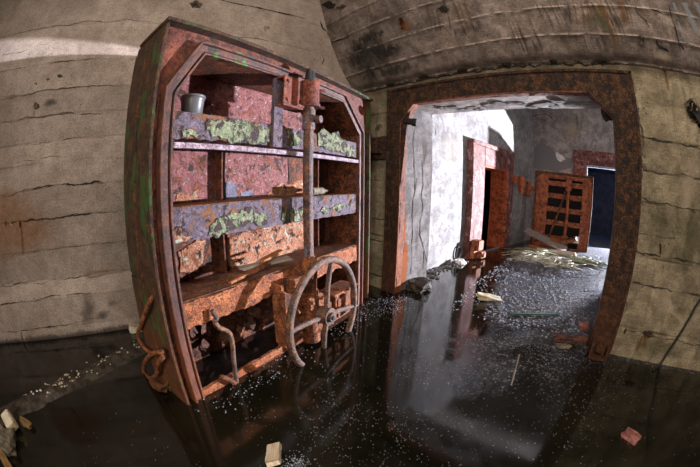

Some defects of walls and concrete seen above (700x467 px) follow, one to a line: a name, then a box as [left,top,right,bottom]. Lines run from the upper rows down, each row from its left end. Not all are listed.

damp [350,32,410,76]
crack [1,85,113,123]
flaking render [437,99,596,111]
crack [644,137,700,149]
crack [0,180,103,197]
crack [2,212,116,224]
crack [636,251,700,264]
crack [633,281,699,296]